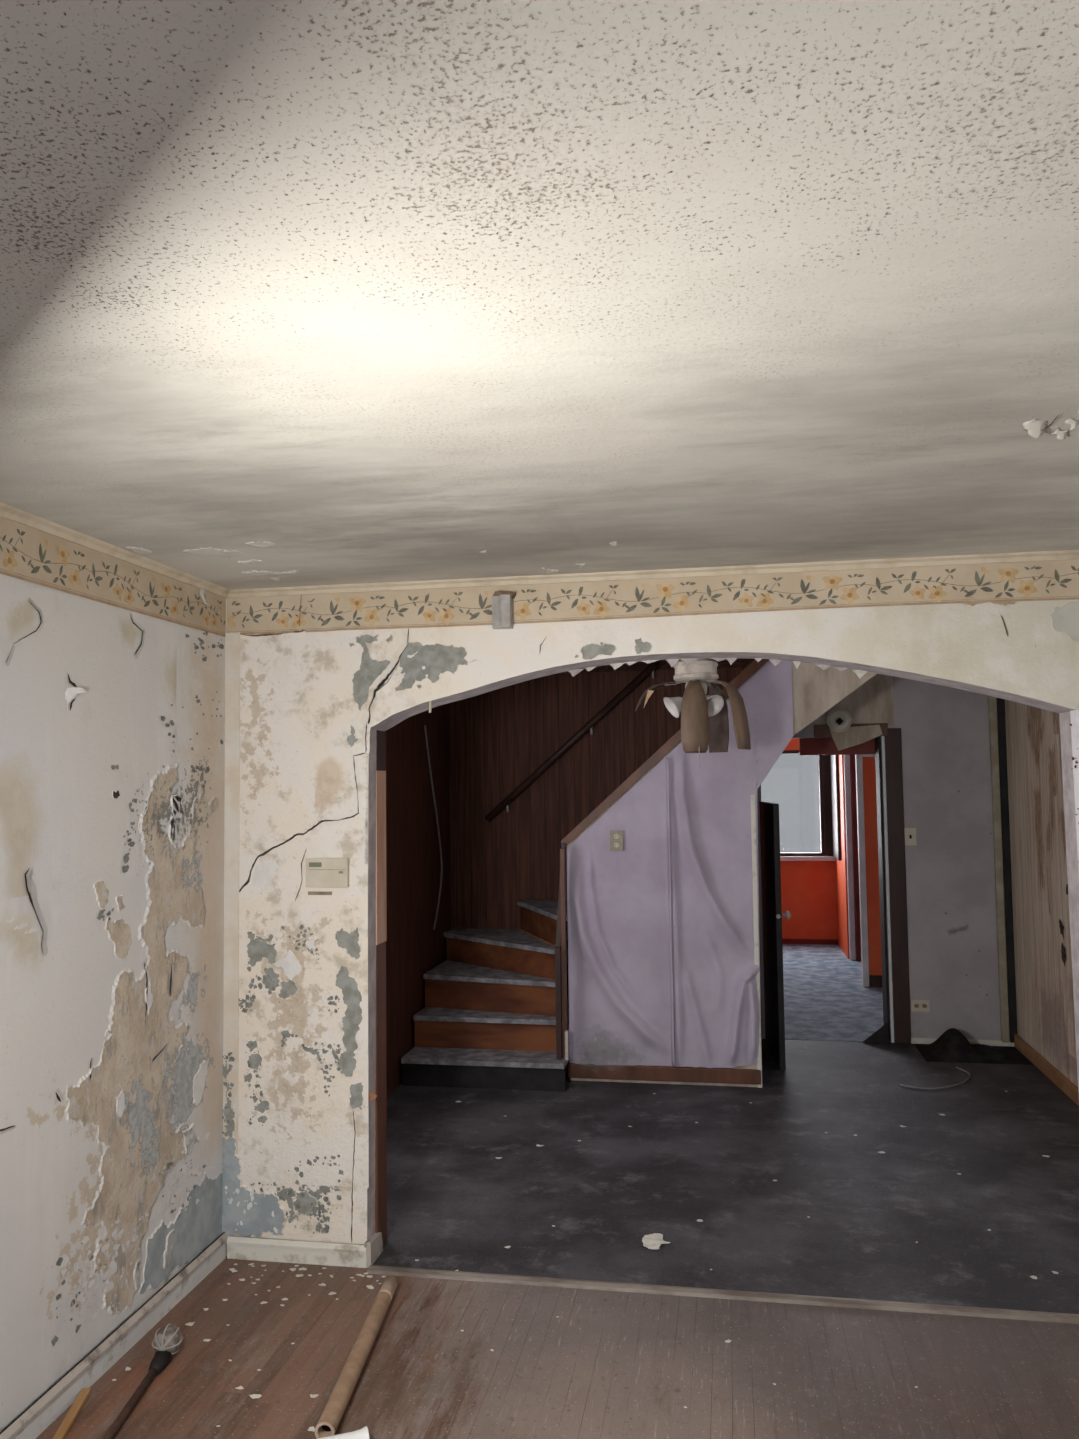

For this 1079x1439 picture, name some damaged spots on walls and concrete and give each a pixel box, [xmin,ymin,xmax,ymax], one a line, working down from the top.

peeling [346,634,468,748]
crack [239,628,409,896]
crack [24,868,48,956]
peeling [0,635,369,1431]
crack [0,1125,16,1135]